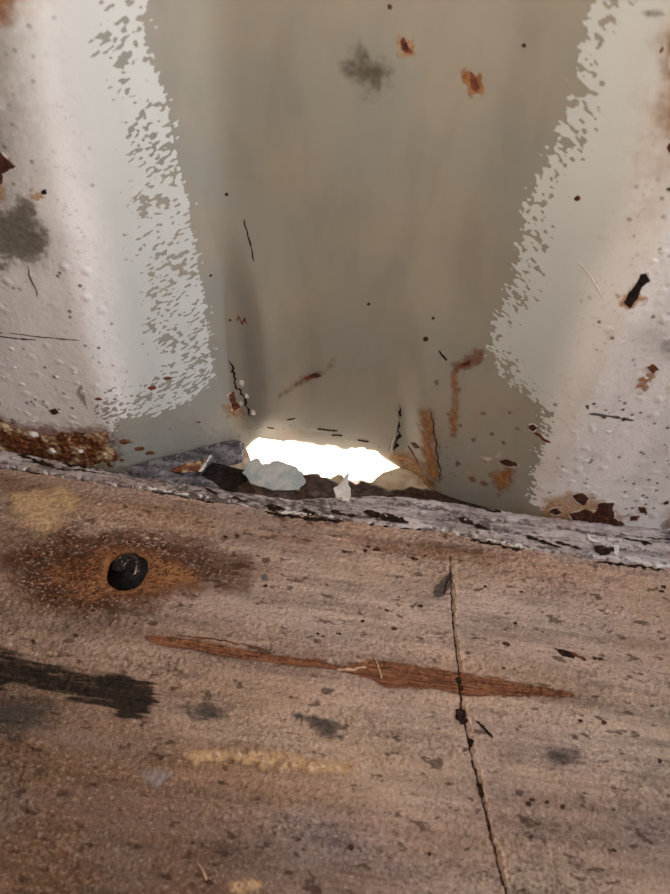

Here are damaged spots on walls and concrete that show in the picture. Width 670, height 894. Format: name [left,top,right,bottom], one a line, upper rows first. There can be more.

rust [461,71,484,98]
rust [0,152,16,202]
peeling [81,0,218,449]
peeling [485,0,650,511]
rust [450,352,482,436]
rust [0,417,155,469]
rust [393,442,433,490]
rust [543,493,648,526]
rust [4,529,249,615]
leakage [0,649,160,740]
crack [444,556,509,894]